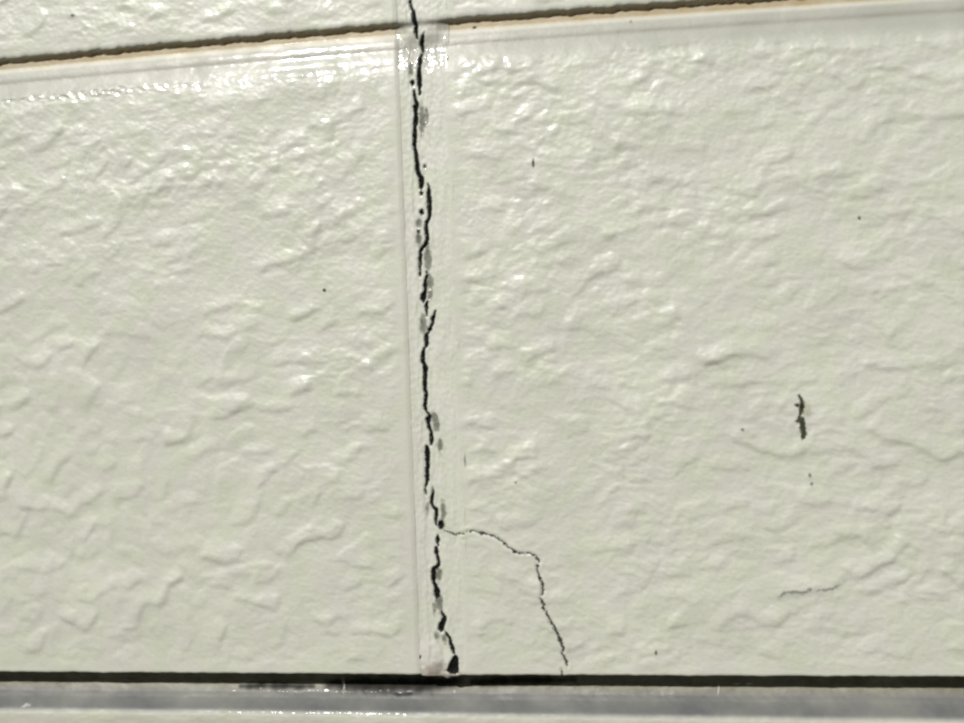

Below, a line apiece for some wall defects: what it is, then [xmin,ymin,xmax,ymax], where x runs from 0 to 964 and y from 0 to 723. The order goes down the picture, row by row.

crack [410,0,568,675]